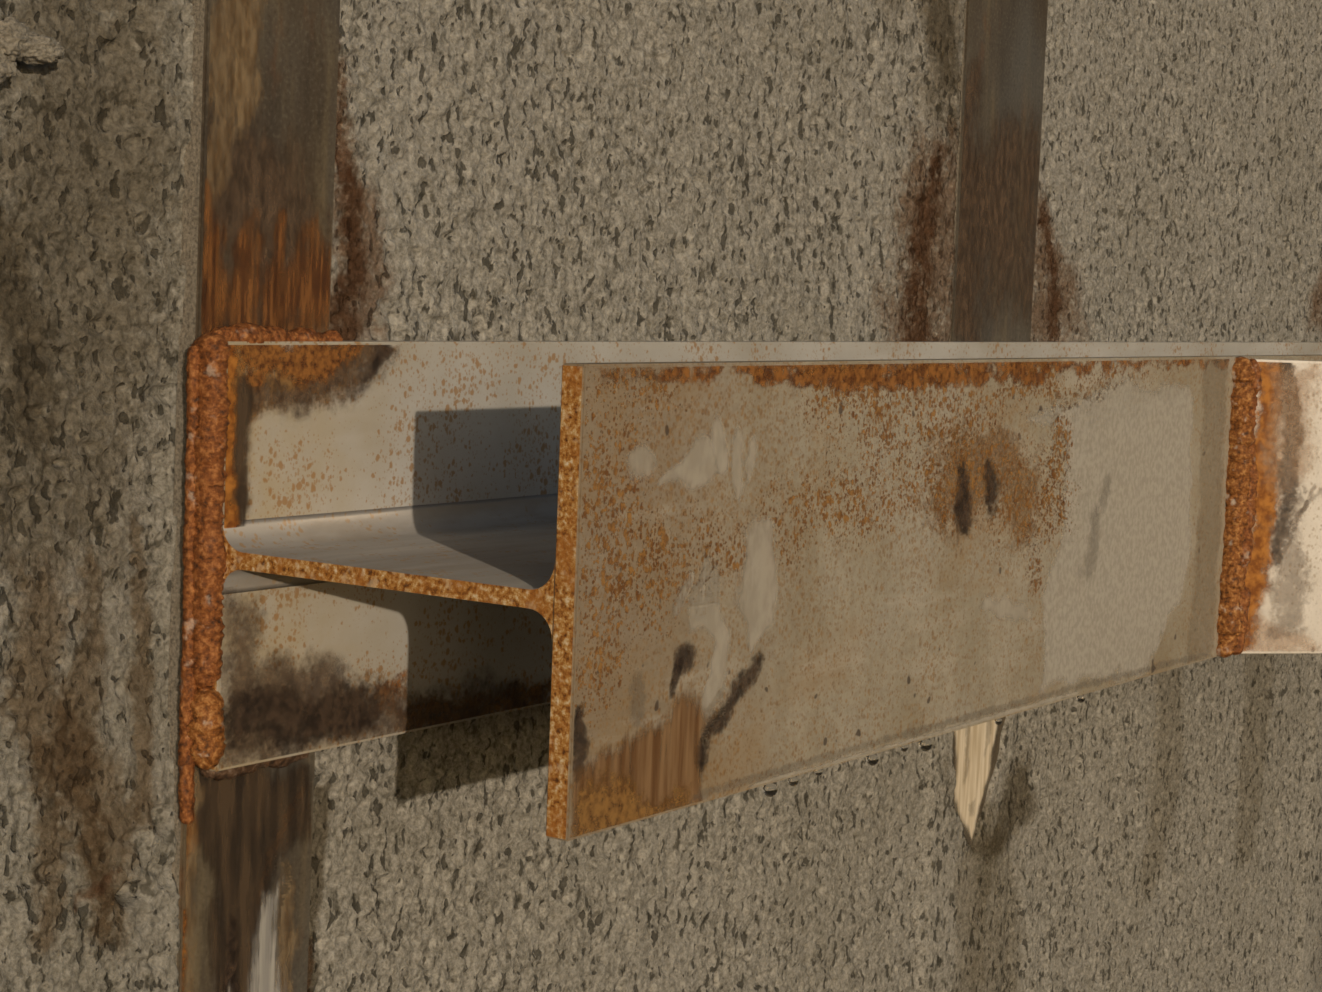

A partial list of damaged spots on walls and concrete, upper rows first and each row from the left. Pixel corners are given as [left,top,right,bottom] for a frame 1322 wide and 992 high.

spalling [0,16,65,84]
rust [201,182,396,528]
rust [575,359,1229,727]
rust [223,600,551,765]
rust [573,695,705,837]